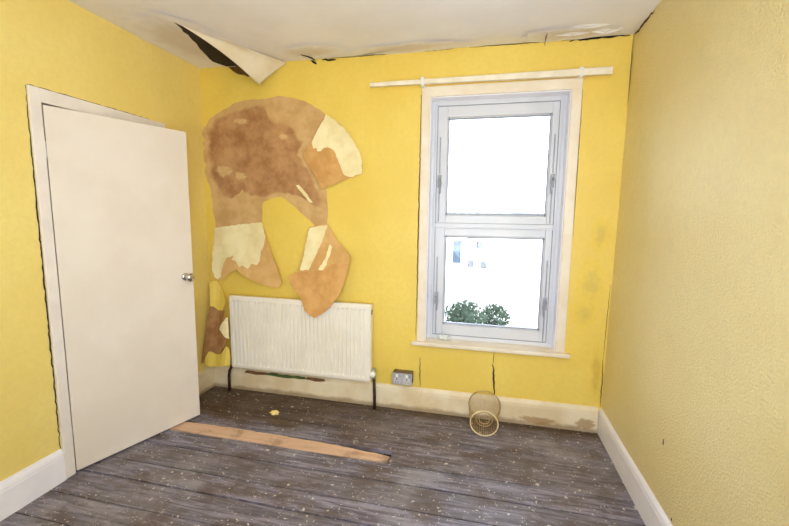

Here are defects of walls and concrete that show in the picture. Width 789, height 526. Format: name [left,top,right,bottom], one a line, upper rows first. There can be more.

peeling [302,115,362,190]
peeling [201,222,351,367]
crack [489,356,497,394]